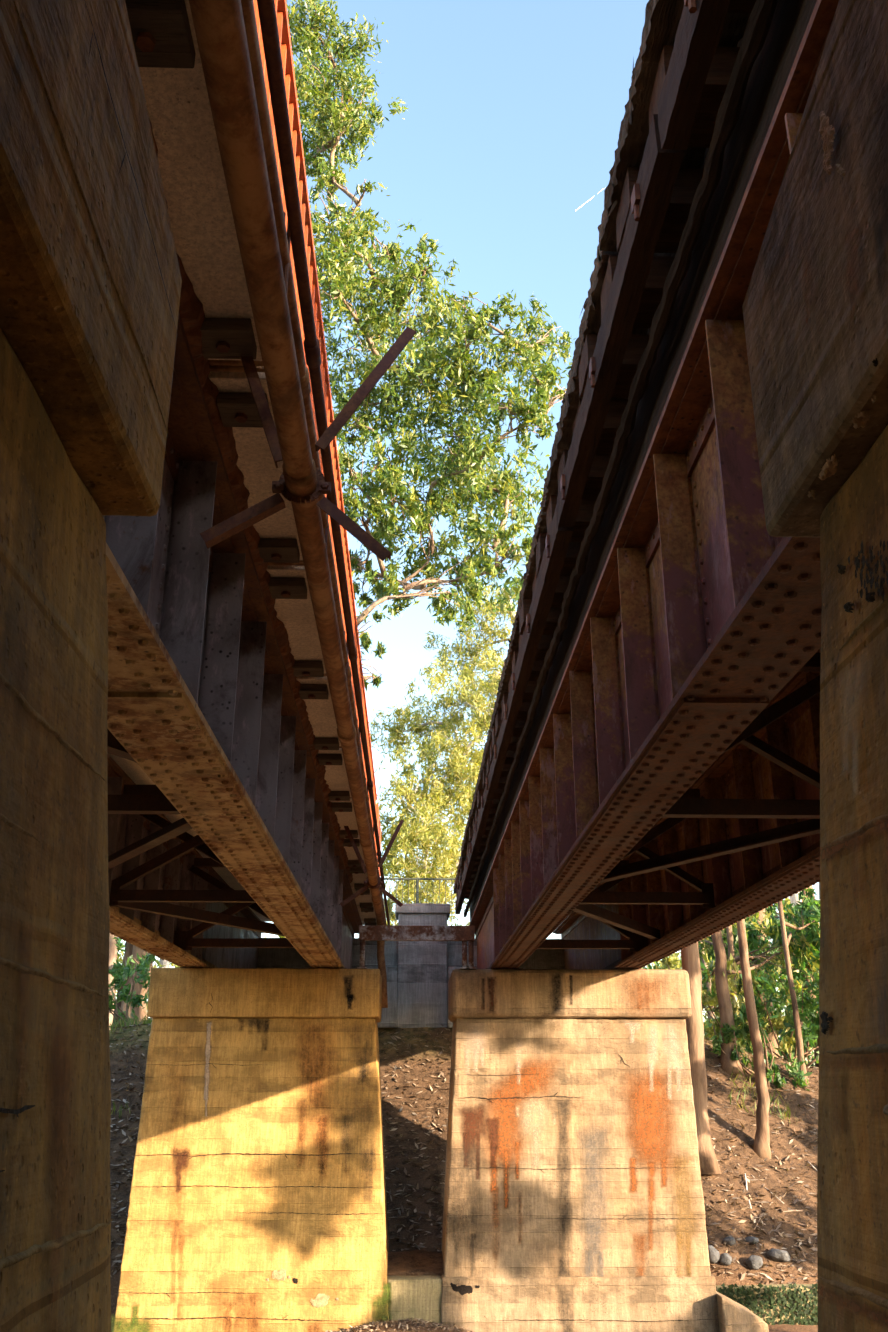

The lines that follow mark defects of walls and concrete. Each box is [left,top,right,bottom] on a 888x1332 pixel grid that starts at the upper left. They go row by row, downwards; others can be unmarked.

corrosion [174,1150,189,1191]
corrosion [299,1027,326,1174]
corrosion [462,1062,549,1242]
corrosion [629,1074,690,1276]